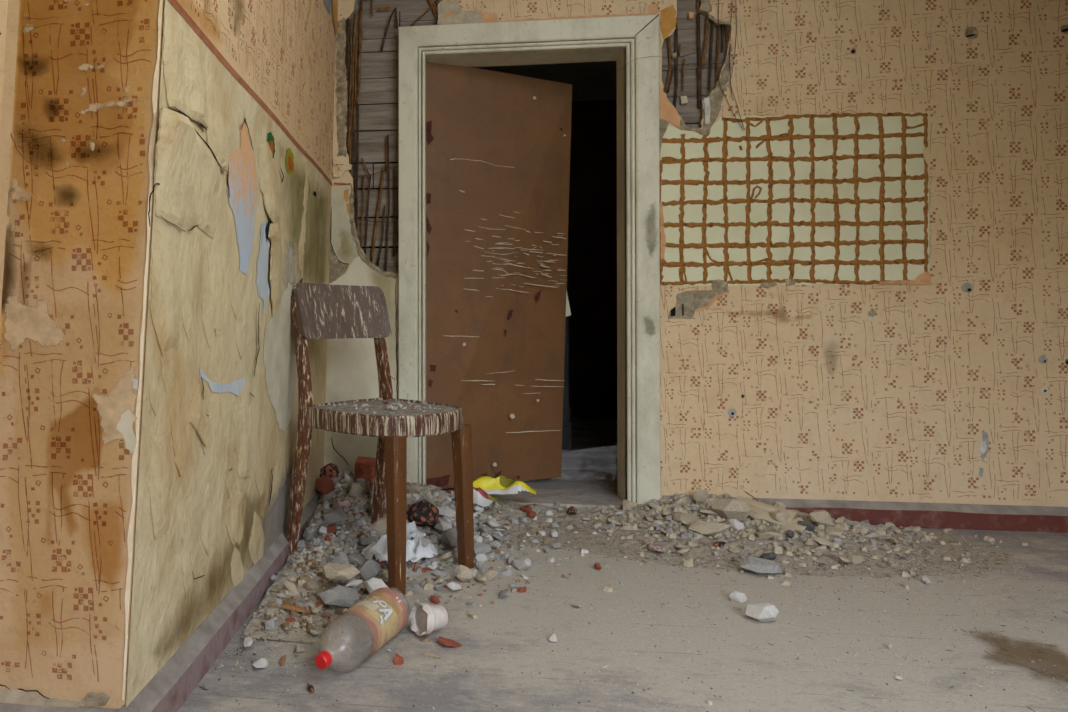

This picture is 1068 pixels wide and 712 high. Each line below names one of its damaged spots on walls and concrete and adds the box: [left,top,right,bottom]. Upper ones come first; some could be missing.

peeling [0,0,163,708]
peeling [226,118,297,430]
peeling [324,430,378,472]
spalling [426,475,450,487]
flaking render [324,0,732,403]
water stain [978,635,1068,682]